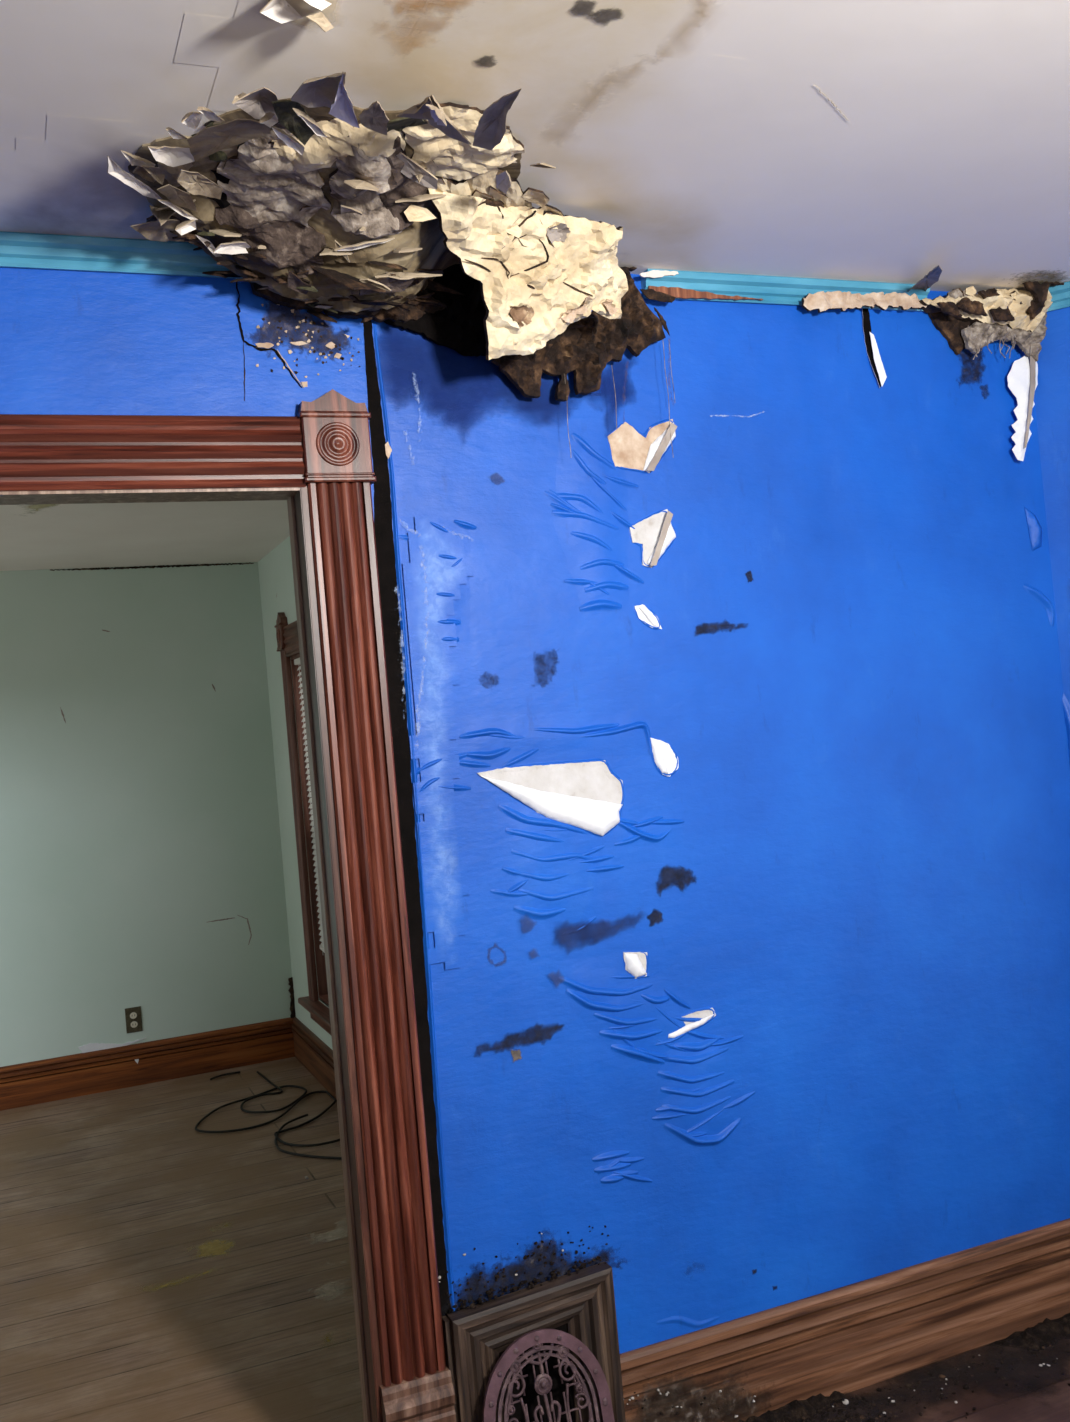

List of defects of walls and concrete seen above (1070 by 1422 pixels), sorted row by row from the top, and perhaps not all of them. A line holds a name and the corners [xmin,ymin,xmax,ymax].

peeling [260,0,335,32]
damp [174,0,762,274]
flaking render [107,72,763,458]
flaking render [802,265,1064,361]
damp [657,866,695,893]
damp [556,910,663,948]